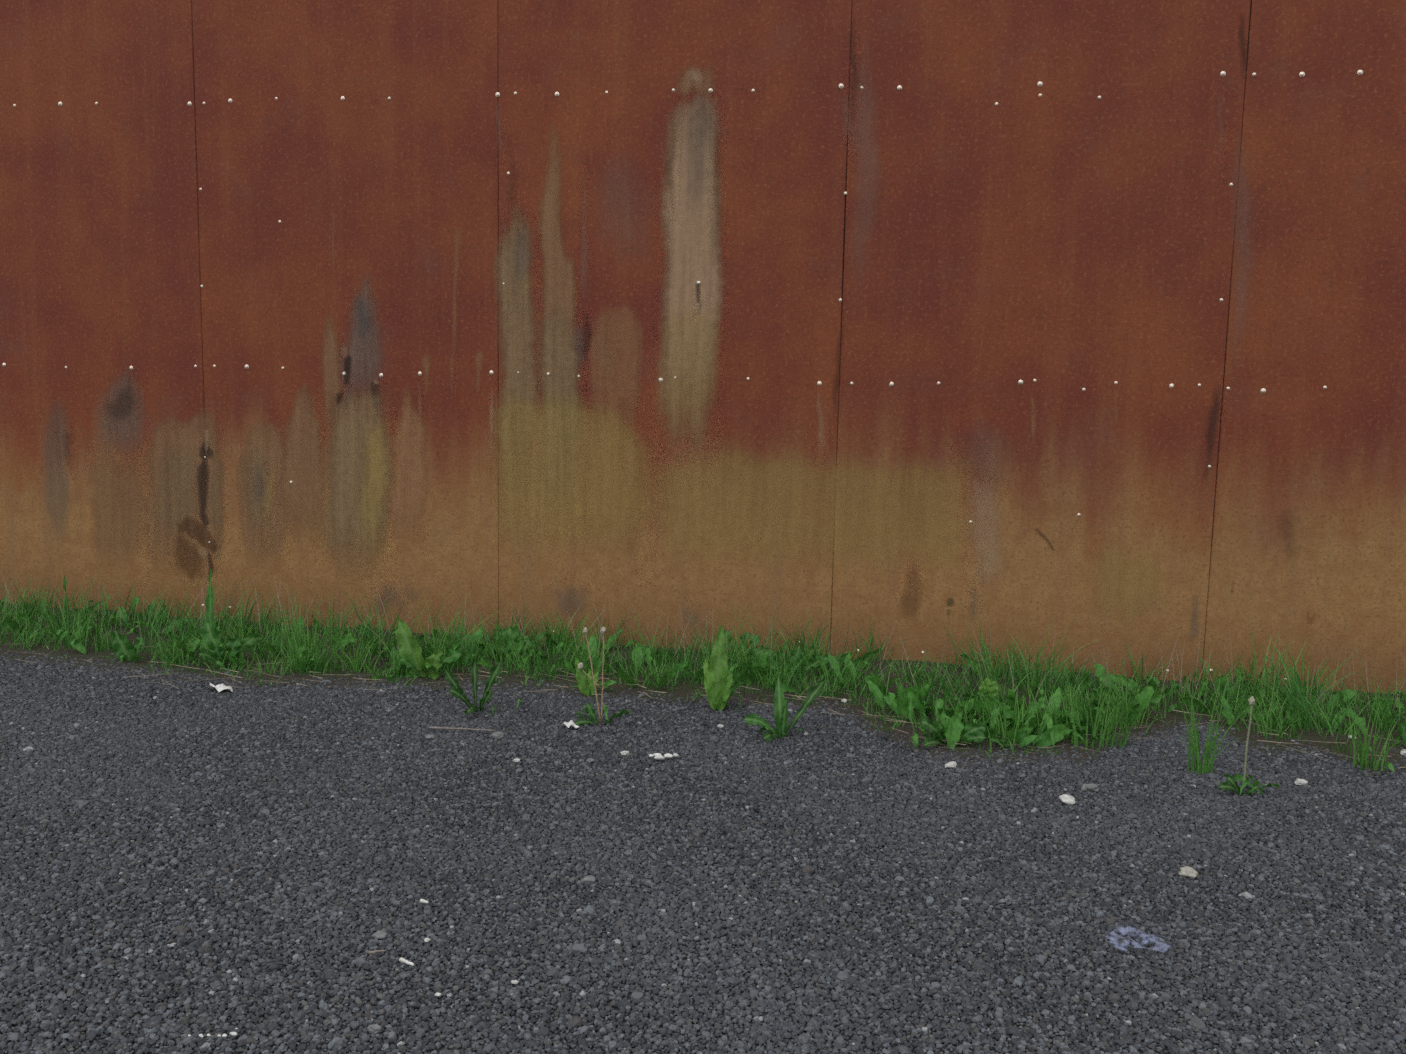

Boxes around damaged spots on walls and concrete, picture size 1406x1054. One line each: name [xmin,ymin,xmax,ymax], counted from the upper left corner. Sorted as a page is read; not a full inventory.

rust [148,419,221,548]
rust [284,305,390,552]
rust [498,150,579,480]
rust [662,70,721,407]